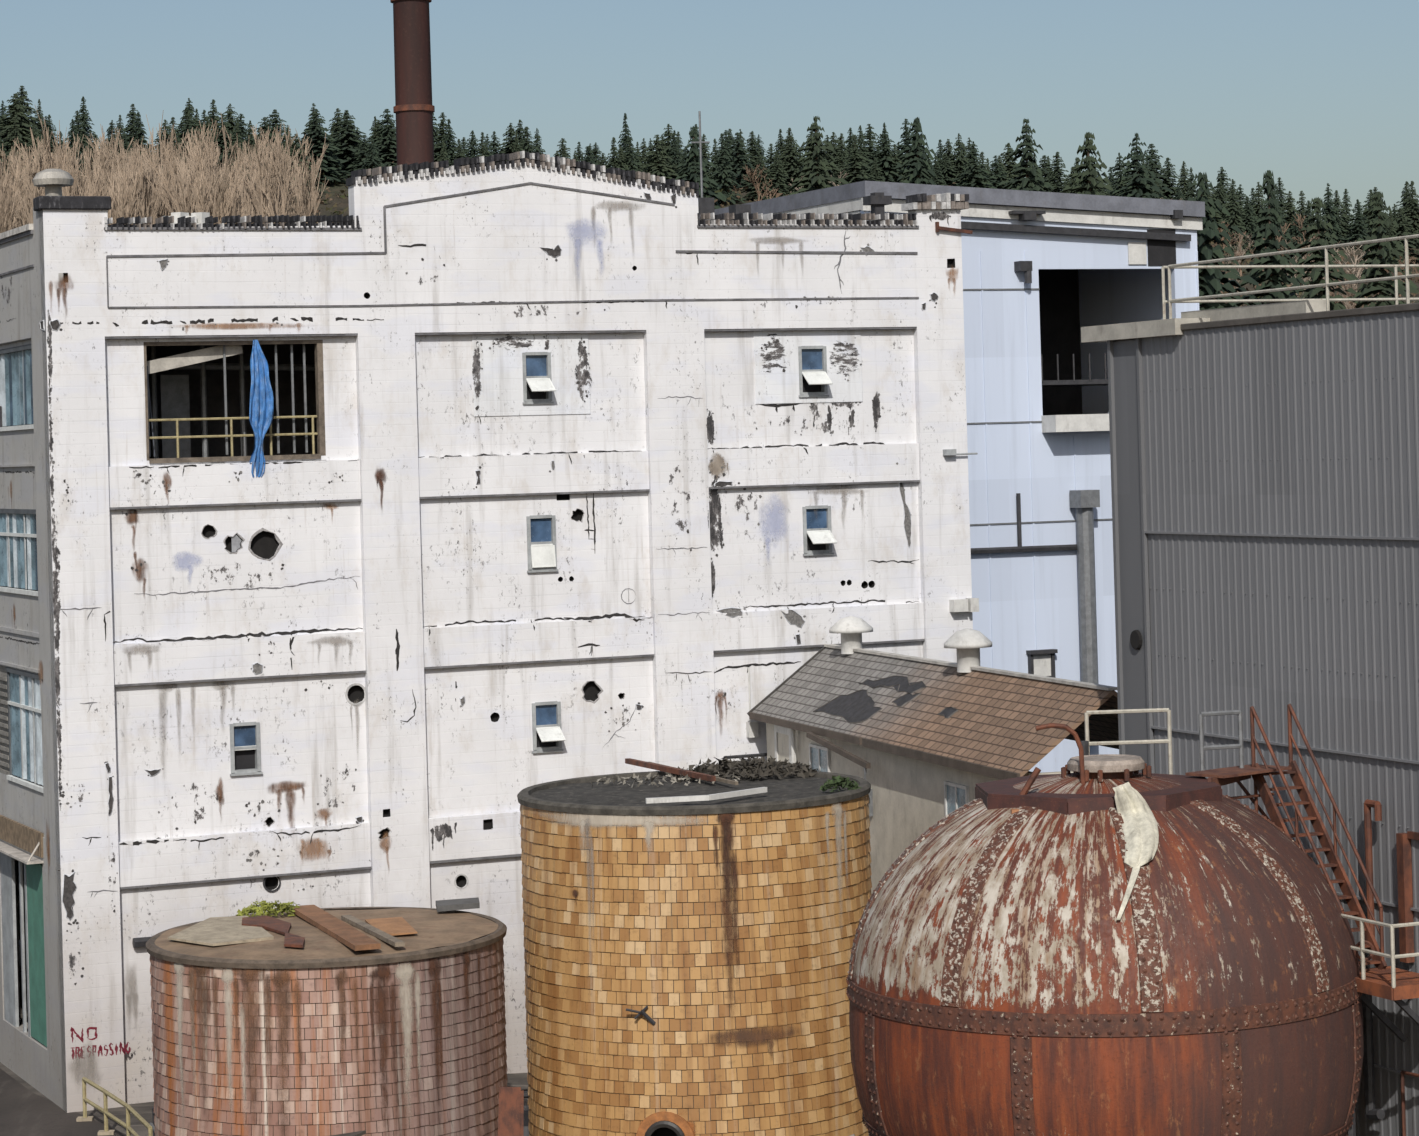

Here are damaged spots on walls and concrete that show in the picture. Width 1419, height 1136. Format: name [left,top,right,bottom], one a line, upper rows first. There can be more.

peeling [575,334,592,402]
peeling [757,333,787,372]
peeling [830,337,862,381]
spalling [201,524,287,591]
crack [745,599,918,613]
crack [60,576,709,722]
crack [670,661,801,682]
corrosion [272,782,304,821]
corrosion [302,839,331,858]
water stain [174,963,194,1092]
efflorescence [223,968,245,1093]
efflorescence [396,965,420,1082]